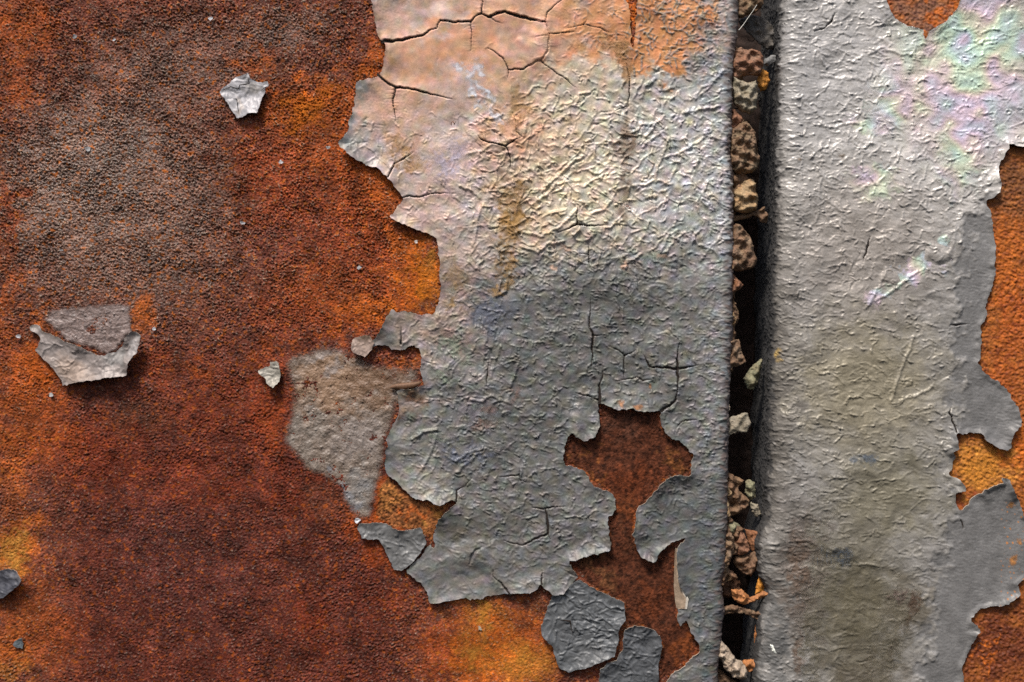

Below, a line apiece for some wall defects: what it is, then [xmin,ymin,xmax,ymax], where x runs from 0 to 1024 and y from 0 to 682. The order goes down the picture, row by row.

crack [381,0,607,84]
peeling [220,73,269,118]
crack [376,73,450,120]
crack [479,114,520,166]
corrosion [730,0,779,390]
peeling [16,304,156,386]
peeling [258,0,739,682]
crack [577,301,697,425]
peeling [740,0,1024,682]
corrosion [728,405,751,435]
corrosion [721,473,768,643]
corrosion [718,640,755,682]